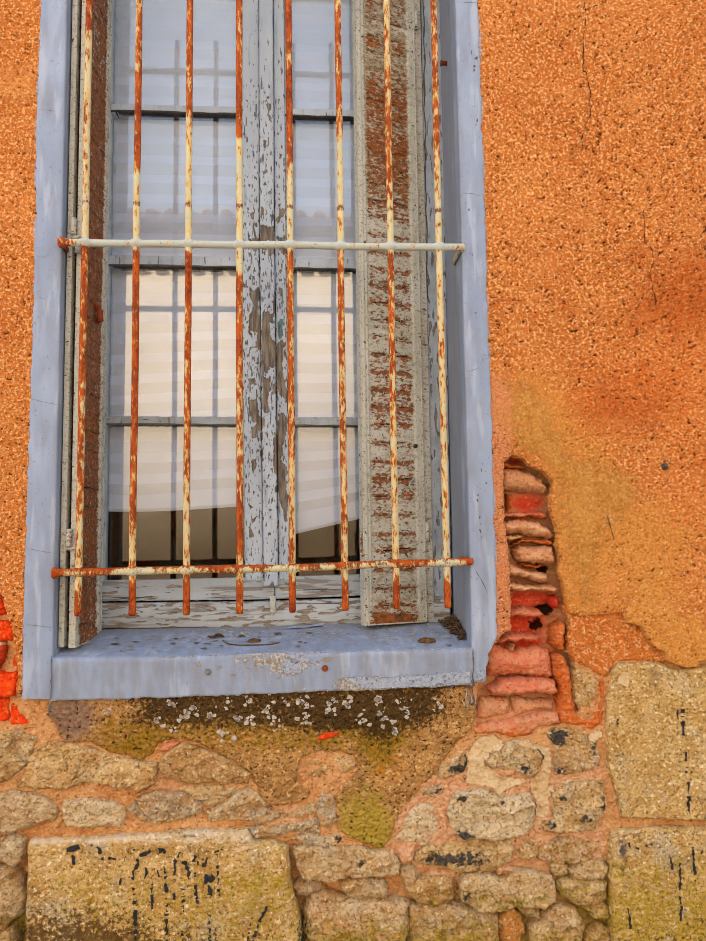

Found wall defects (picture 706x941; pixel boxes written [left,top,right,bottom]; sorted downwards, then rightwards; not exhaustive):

spalling [344,381,635,737]
spalling [0,594,30,725]
spalling [317,730,340,741]